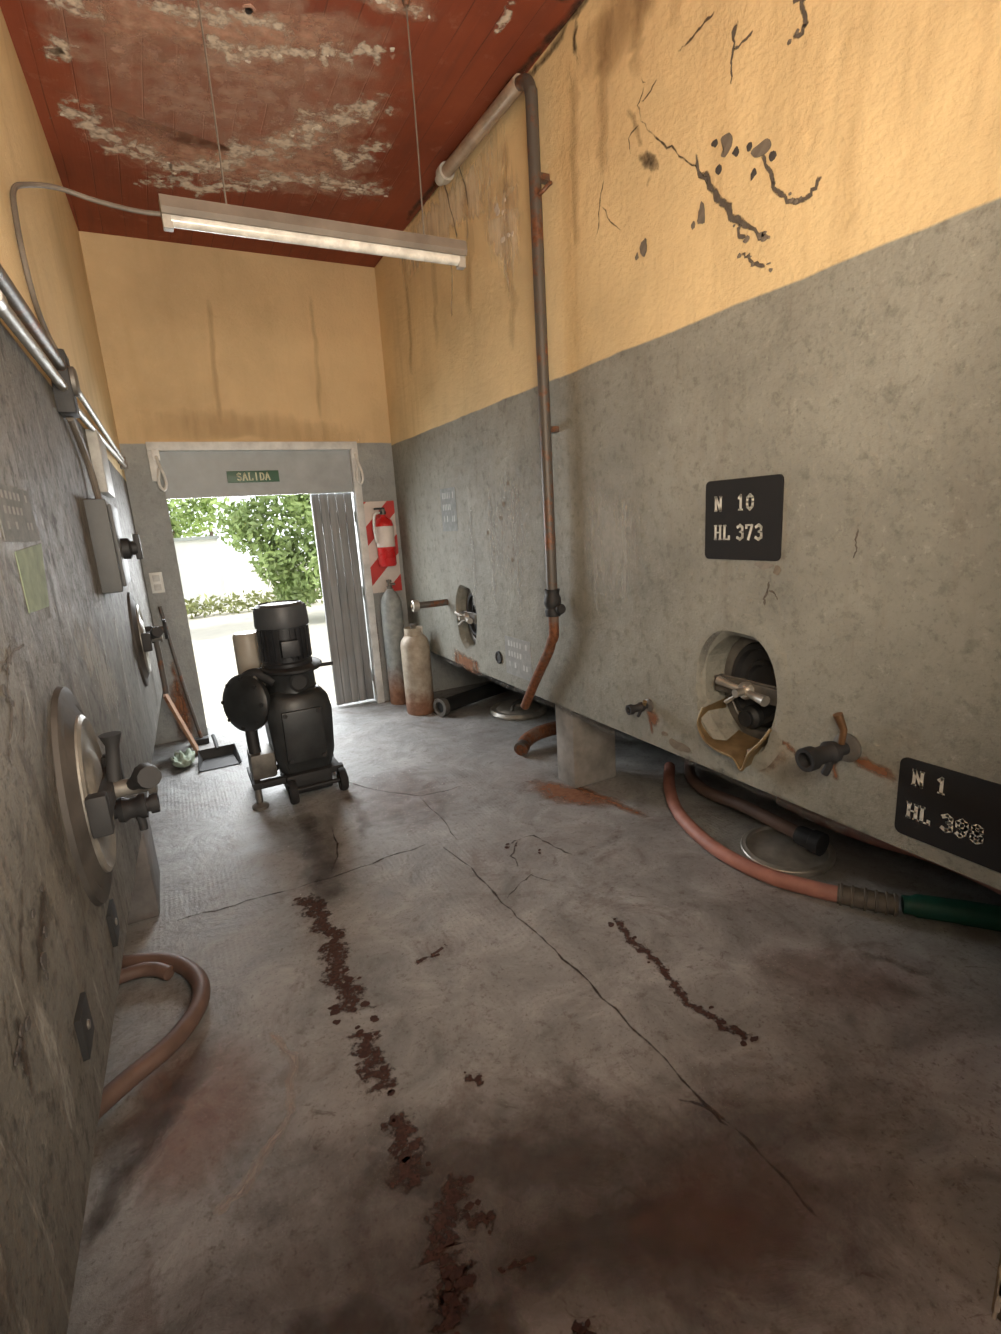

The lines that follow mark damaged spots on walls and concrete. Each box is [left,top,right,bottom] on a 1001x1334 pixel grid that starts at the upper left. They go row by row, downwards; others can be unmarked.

peeling [370,0,430,19]
peeling [494,2,514,33]
crack [787,0,809,45]
crack [682,13,753,83]
crack [628,81,773,272]
crack [762,155,821,205]
crack [183,782,812,1212]